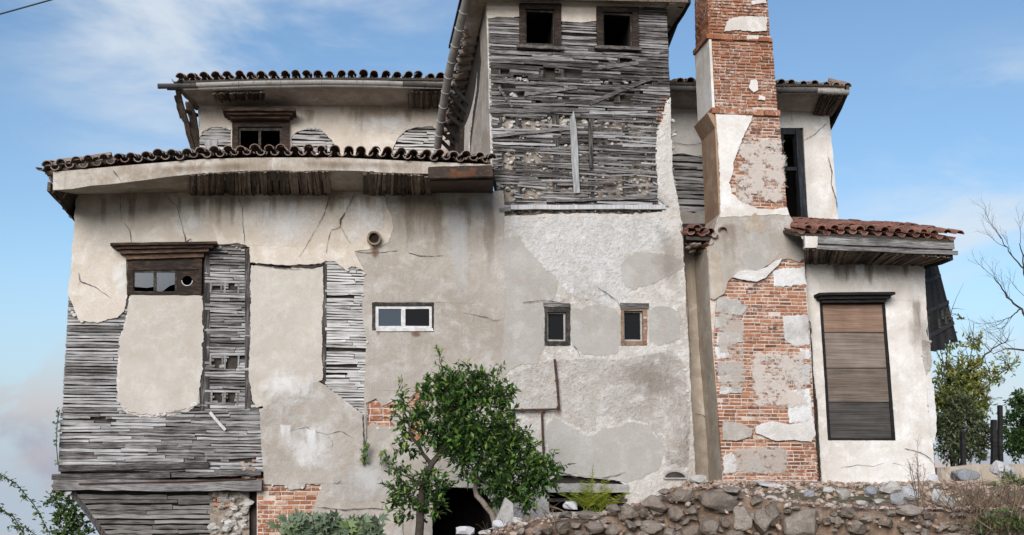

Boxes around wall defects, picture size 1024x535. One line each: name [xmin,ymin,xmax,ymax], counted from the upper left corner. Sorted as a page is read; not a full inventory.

flaking render [200,126,231,151]
flaking render [291,127,333,156]
crack [218,194,442,269]
flaking render [488,7,705,305]
flaking render [58,245,322,535]
flaking render [325,261,396,430]